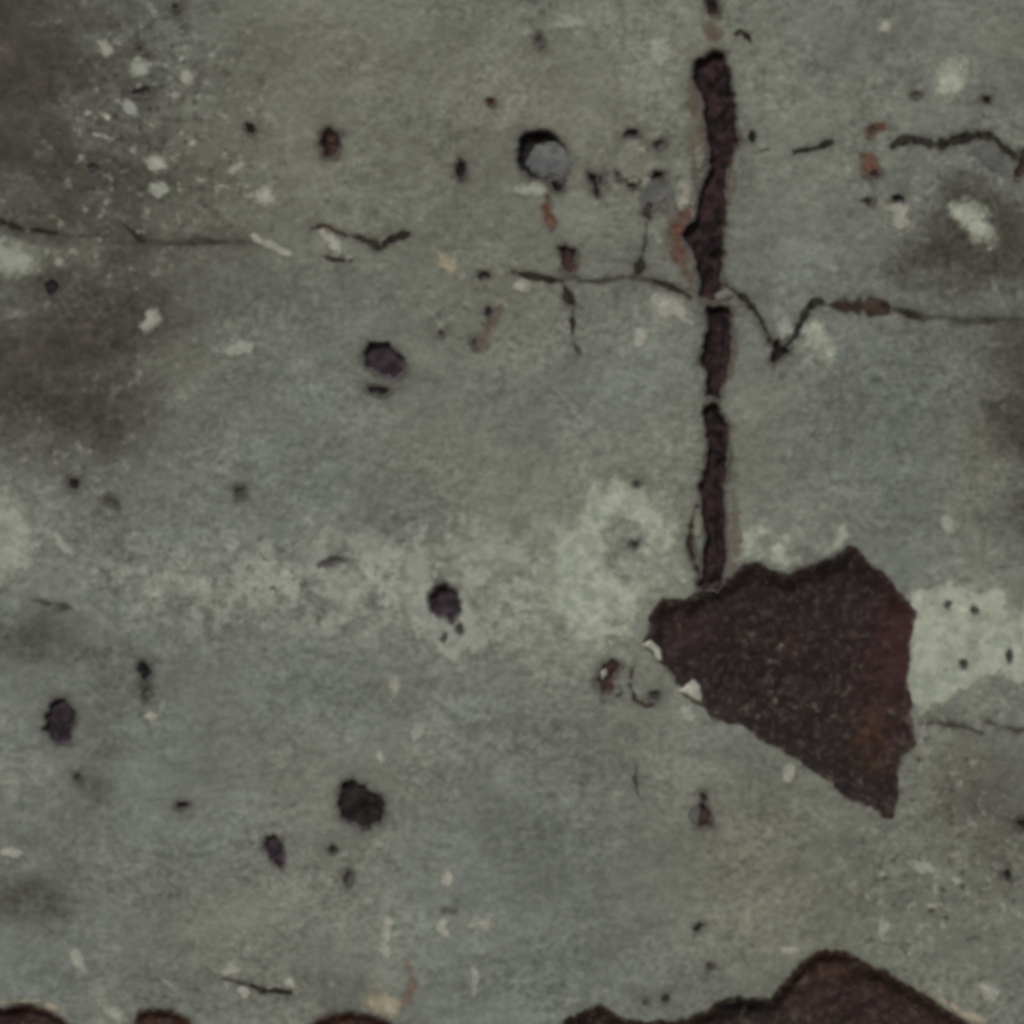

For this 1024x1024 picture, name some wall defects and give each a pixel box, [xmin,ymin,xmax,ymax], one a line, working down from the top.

crack [889,130,1018,159]
crack [0,219,243,244]
crack [312,223,411,262]
crack [511,0,922,594]
spalling [362,340,408,398]
spalling [425,582,465,644]
spalling [642,545,917,819]
spalling [40,697,78,747]
spalling [337,777,387,832]
spalling [0,1003,67,1024]
spalling [311,1011,391,1024]
spalling [562,949,971,1024]